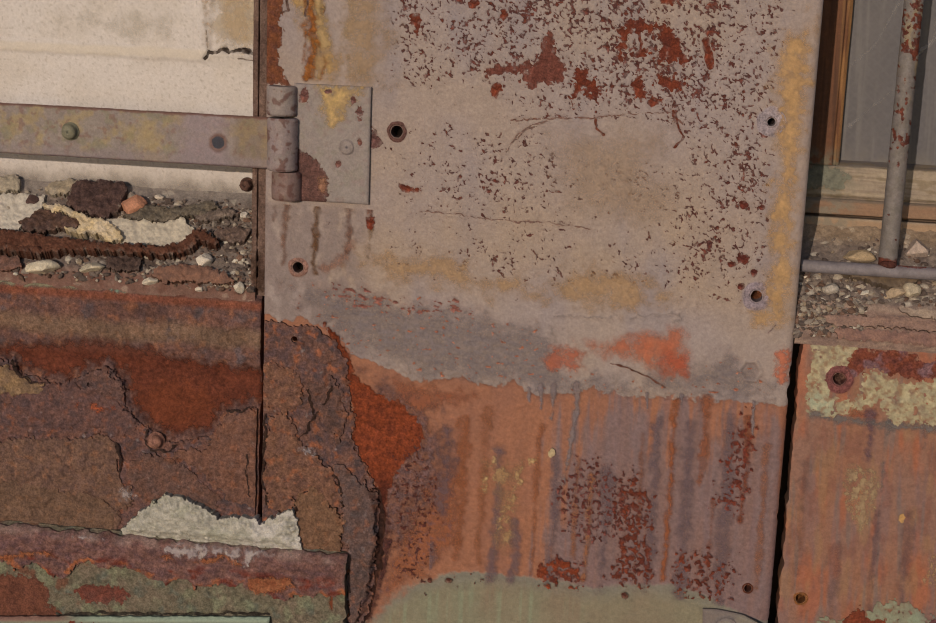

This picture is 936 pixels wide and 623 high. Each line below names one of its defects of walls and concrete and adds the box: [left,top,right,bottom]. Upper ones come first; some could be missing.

rust [409,13,422,36]
crack [203,30,253,61]
rust [484,30,608,111]
rust [615,17,693,107]
rust [702,37,714,70]
spalling [0,174,21,194]
spalling [44,178,79,198]
rust [843,348,936,382]
peeling [804,345,936,427]
rust [0,319,443,623]
rust [531,395,770,605]
peeling [855,598,936,623]